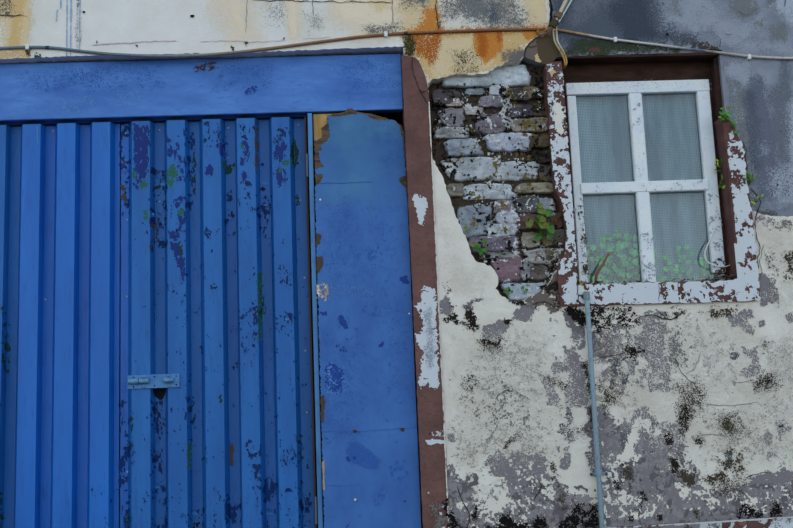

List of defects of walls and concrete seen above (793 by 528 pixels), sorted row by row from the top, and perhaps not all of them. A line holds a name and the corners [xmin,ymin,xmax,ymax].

rust [402,4,547,69]
damp [204,0,793,232]
peeling [412,194,428,226]
peeling [414,285,452,390]
damp [617,342,648,365]
damp [567,357,621,440]
damp [660,303,793,528]
damp [425,458,599,528]
damp [613,461,649,523]